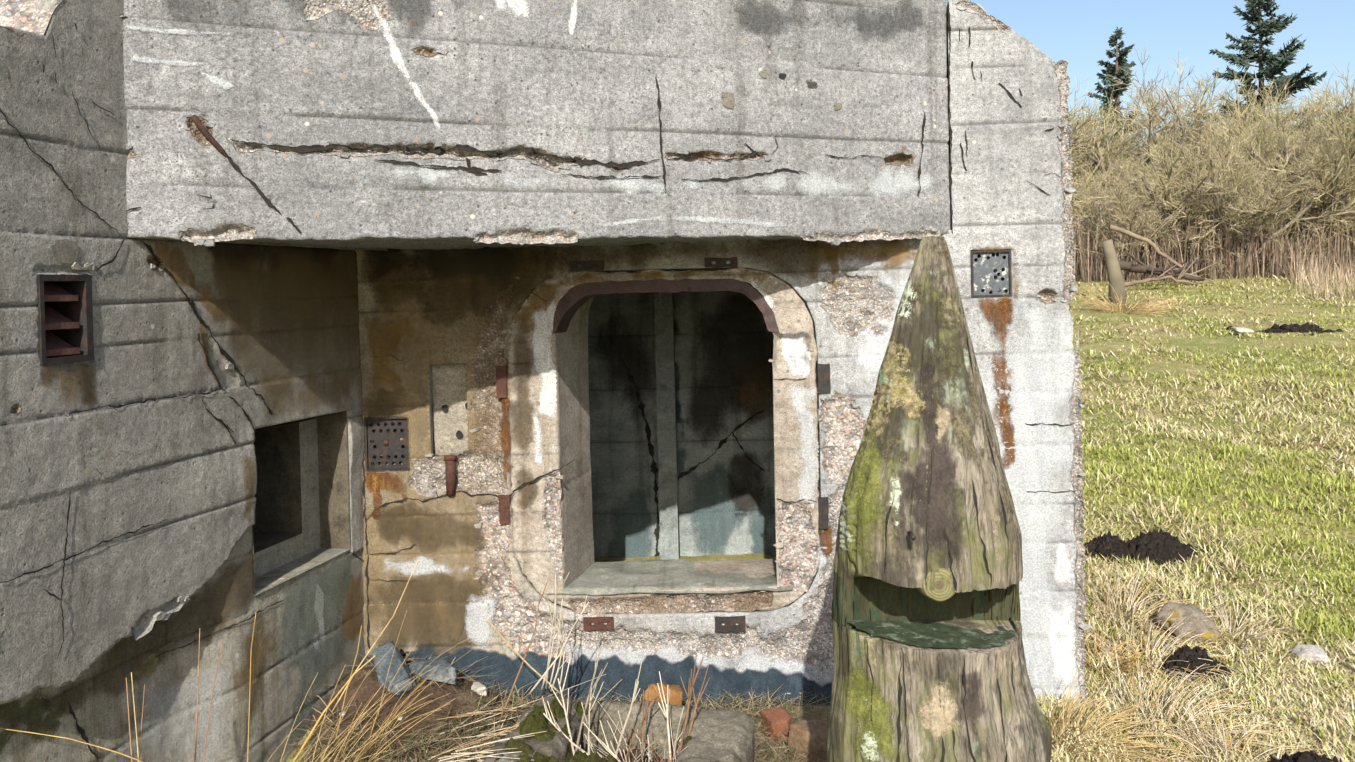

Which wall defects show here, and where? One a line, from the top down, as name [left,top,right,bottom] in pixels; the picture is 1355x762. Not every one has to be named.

crack [0,108,273,444]
corrosion [190,114,229,158]
spalling [473,225,579,245]
crack [228,77,886,233]
spalling [819,270,897,337]
corrosion [980,259,1019,468]
corrosion [365,472,406,519]
crack [344,451,575,650]
spalling [408,297,866,672]
crack [620,353,817,556]
water stain [49,552,256,712]
water stain [291,695,315,741]